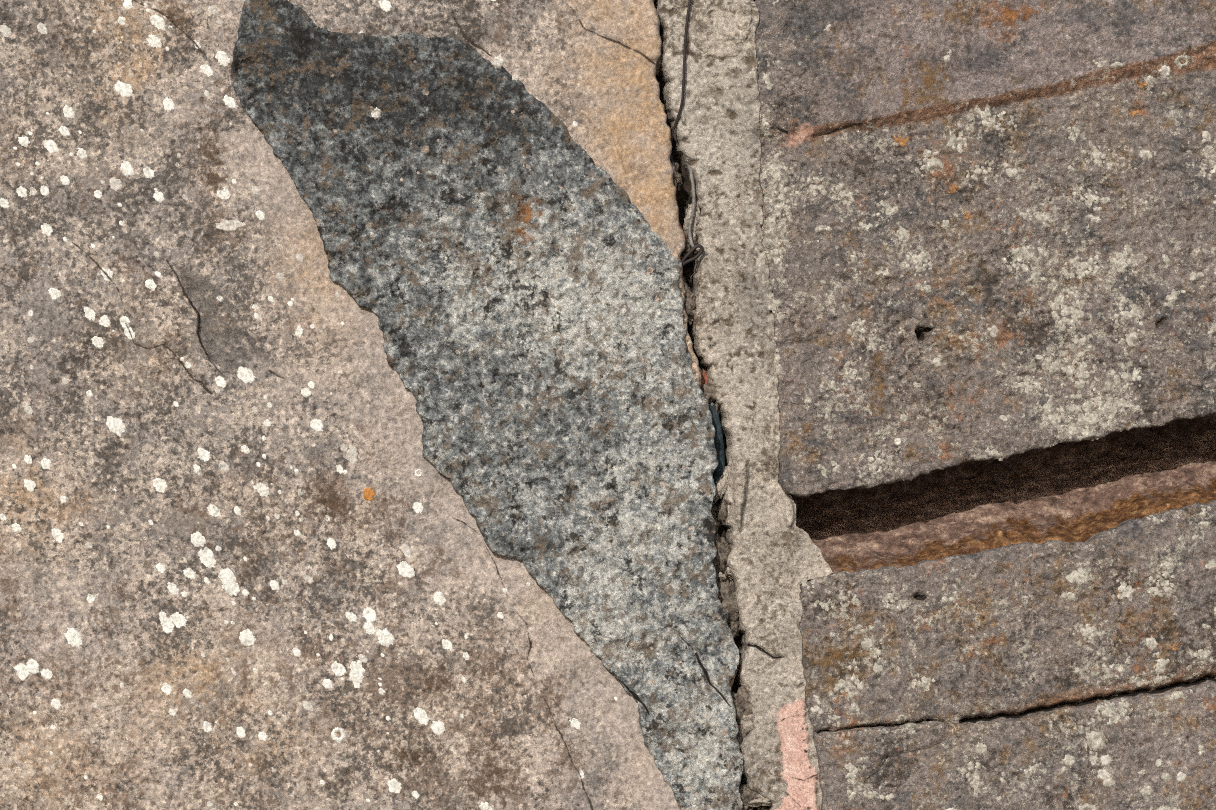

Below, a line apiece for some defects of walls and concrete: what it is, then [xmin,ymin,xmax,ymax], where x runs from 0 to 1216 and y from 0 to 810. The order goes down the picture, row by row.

crack [572,0,785,810]
crack [817,675,1216,782]